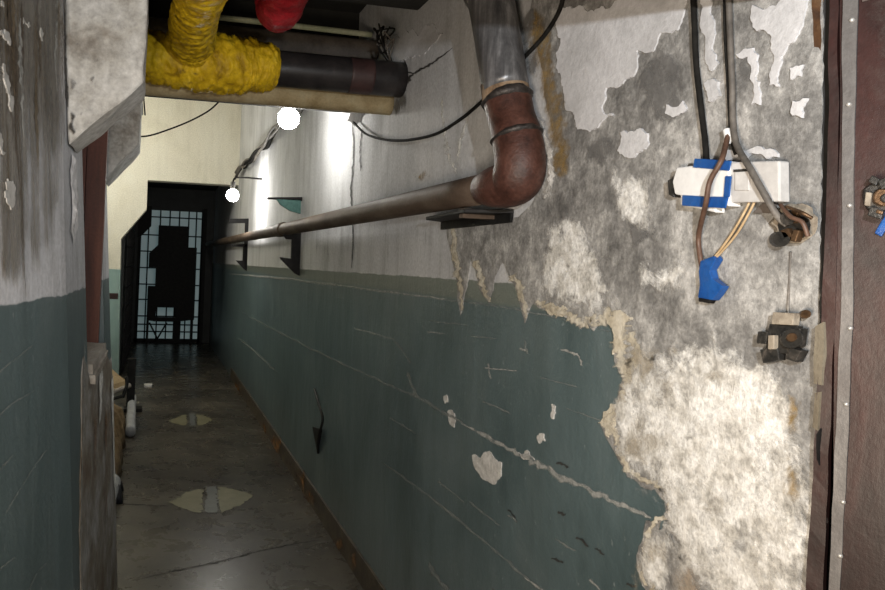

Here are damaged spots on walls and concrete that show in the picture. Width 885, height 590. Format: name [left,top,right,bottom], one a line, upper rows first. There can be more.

peeling [0,29,11,46]
peeling [2,63,14,112]
leakage [0,0,65,291]
peeling [3,178,16,210]
spalling [447,0,824,590]
peeling [443,395,456,427]